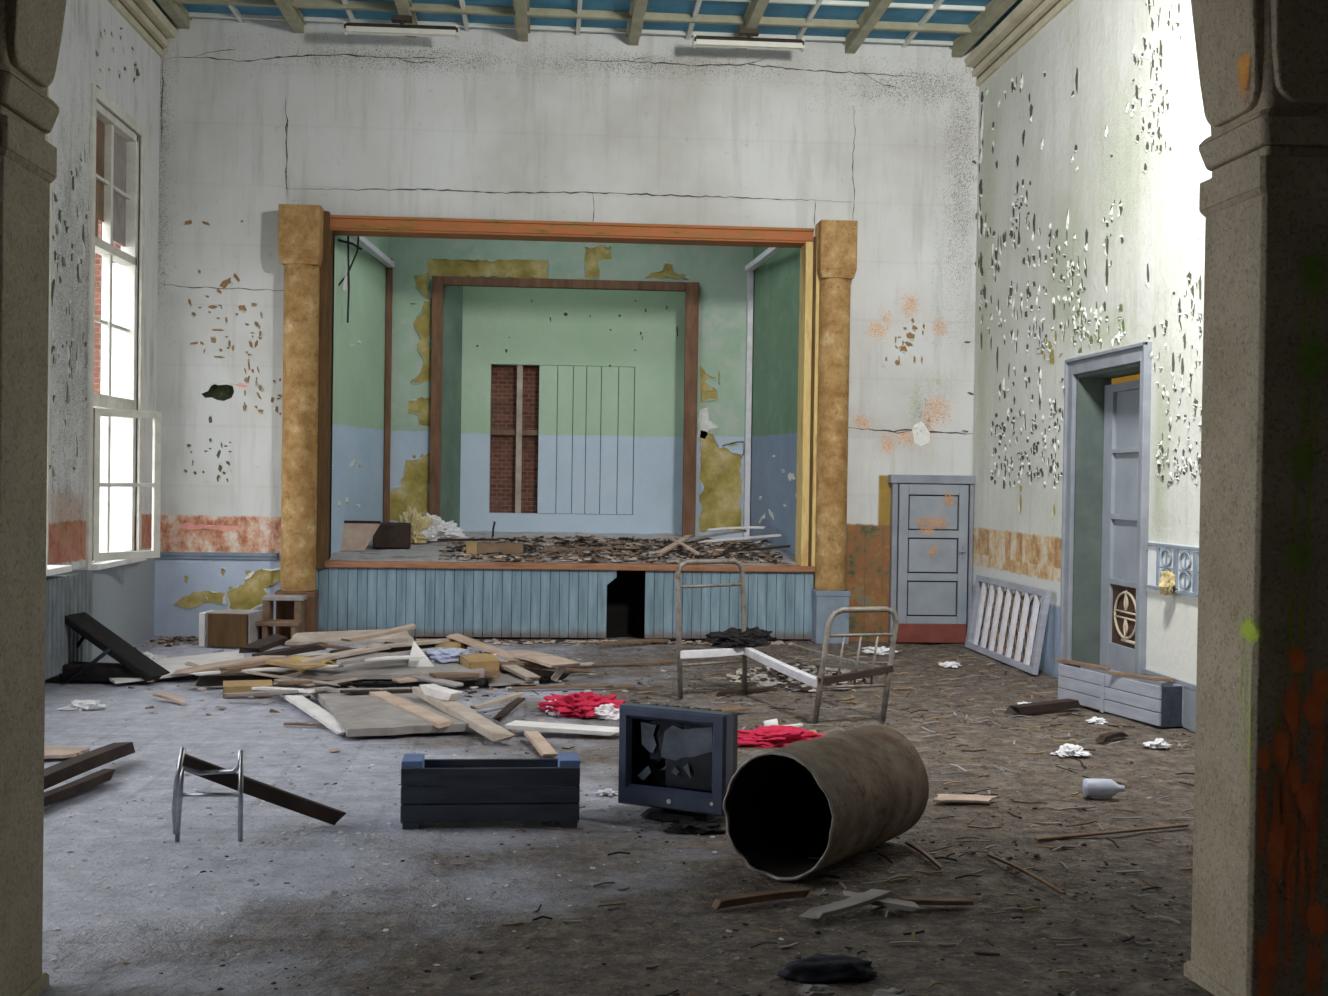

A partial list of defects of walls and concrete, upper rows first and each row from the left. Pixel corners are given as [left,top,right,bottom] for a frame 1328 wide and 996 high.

crack [323,106,856,225]
crack [587,56,910,89]
peeling [1125,0,1181,173]
peeling [49,190,94,491]
peeling [184,273,282,482]
peeling [407,259,549,427]
peeling [584,245,612,279]
peeling [646,263,688,280]
peeling [963,72,1126,518]
peeling [1148,271,1202,486]
peeling [390,453,430,523]
peeling [173,567,280,610]